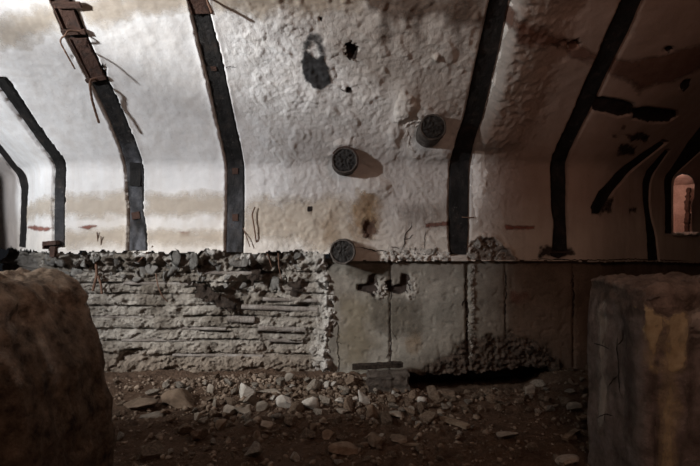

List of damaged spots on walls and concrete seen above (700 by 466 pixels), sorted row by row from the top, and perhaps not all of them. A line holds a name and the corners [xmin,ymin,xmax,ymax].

leakage [304,34,324,63]
spalling [344,40,358,61]
spalling [466,238,517,263]
spalling [357,274,415,297]
crack [356,223,440,361]
spalling [0,247,336,373]
spalling [417,334,562,376]